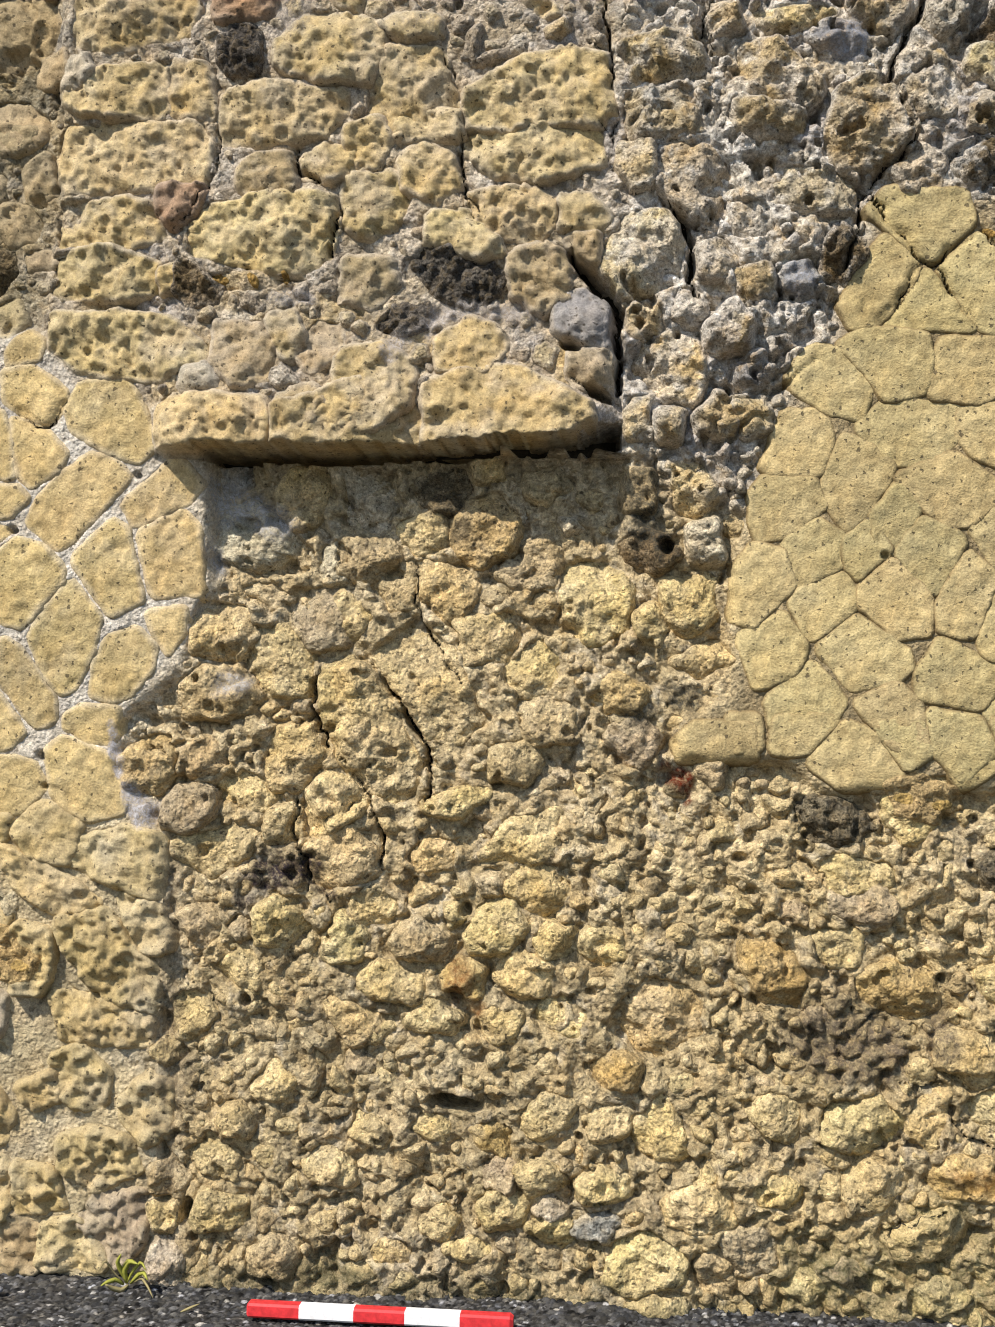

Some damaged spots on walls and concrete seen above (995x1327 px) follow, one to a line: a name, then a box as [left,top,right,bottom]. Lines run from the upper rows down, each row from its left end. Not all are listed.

crack [584,0,620,168]
crack [840,6,995,314]
crack [570,242,623,405]
crack [668,200,694,297]
crack [425,443,616,464]
crack [414,567,460,680]
crack [293,667,386,900]
crack [384,677,433,802]